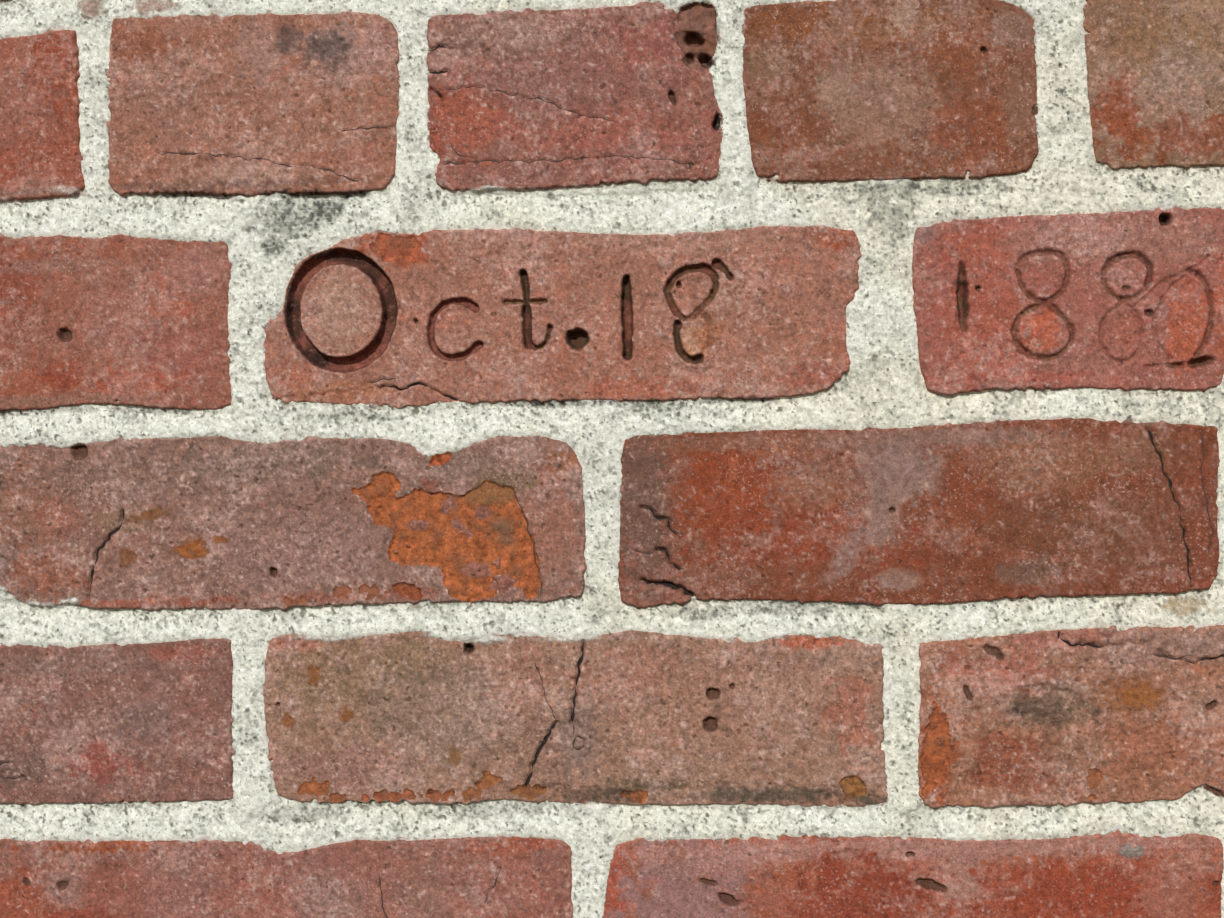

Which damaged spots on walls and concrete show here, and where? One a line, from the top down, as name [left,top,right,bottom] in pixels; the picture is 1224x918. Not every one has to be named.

crack [89,509,124,595]
spalling [332,582,423,601]
spalling [351,451,541,603]
crack [632,507,694,597]
crack [1147,425,1214,588]
crack [525,641,584,788]